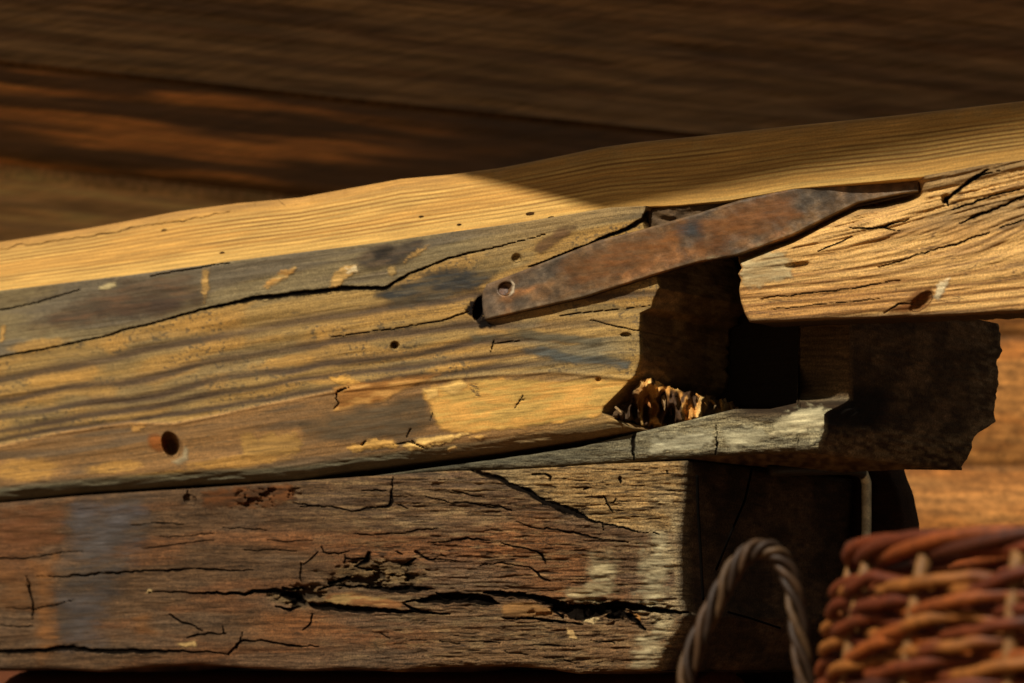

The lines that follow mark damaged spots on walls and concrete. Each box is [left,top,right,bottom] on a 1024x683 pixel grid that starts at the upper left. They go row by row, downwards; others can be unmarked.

crack [536,214,646,265]
crack [822,222,899,250]
crack [892,170,1024,264]
crack [0,250,483,357]
crack [792,284,876,306]
crack [0,435,753,663]